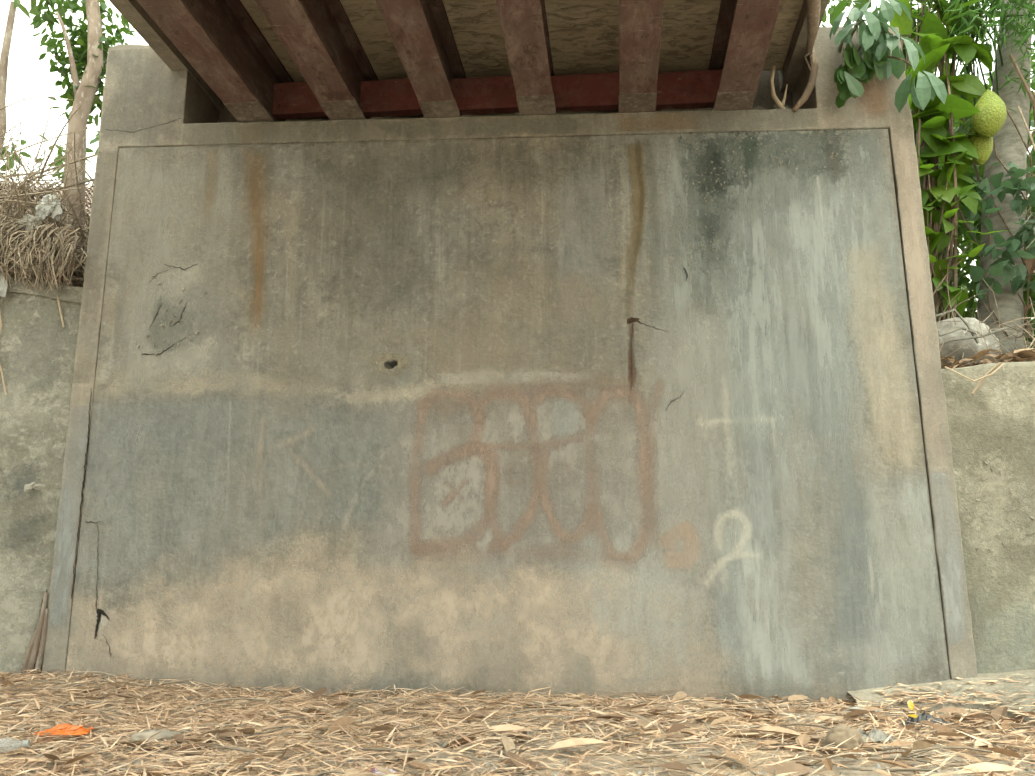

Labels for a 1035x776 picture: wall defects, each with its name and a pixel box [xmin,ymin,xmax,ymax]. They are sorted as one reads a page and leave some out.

crack [39,388,111,658]
water stain [51,414,157,625]
water stain [354,129,894,691]